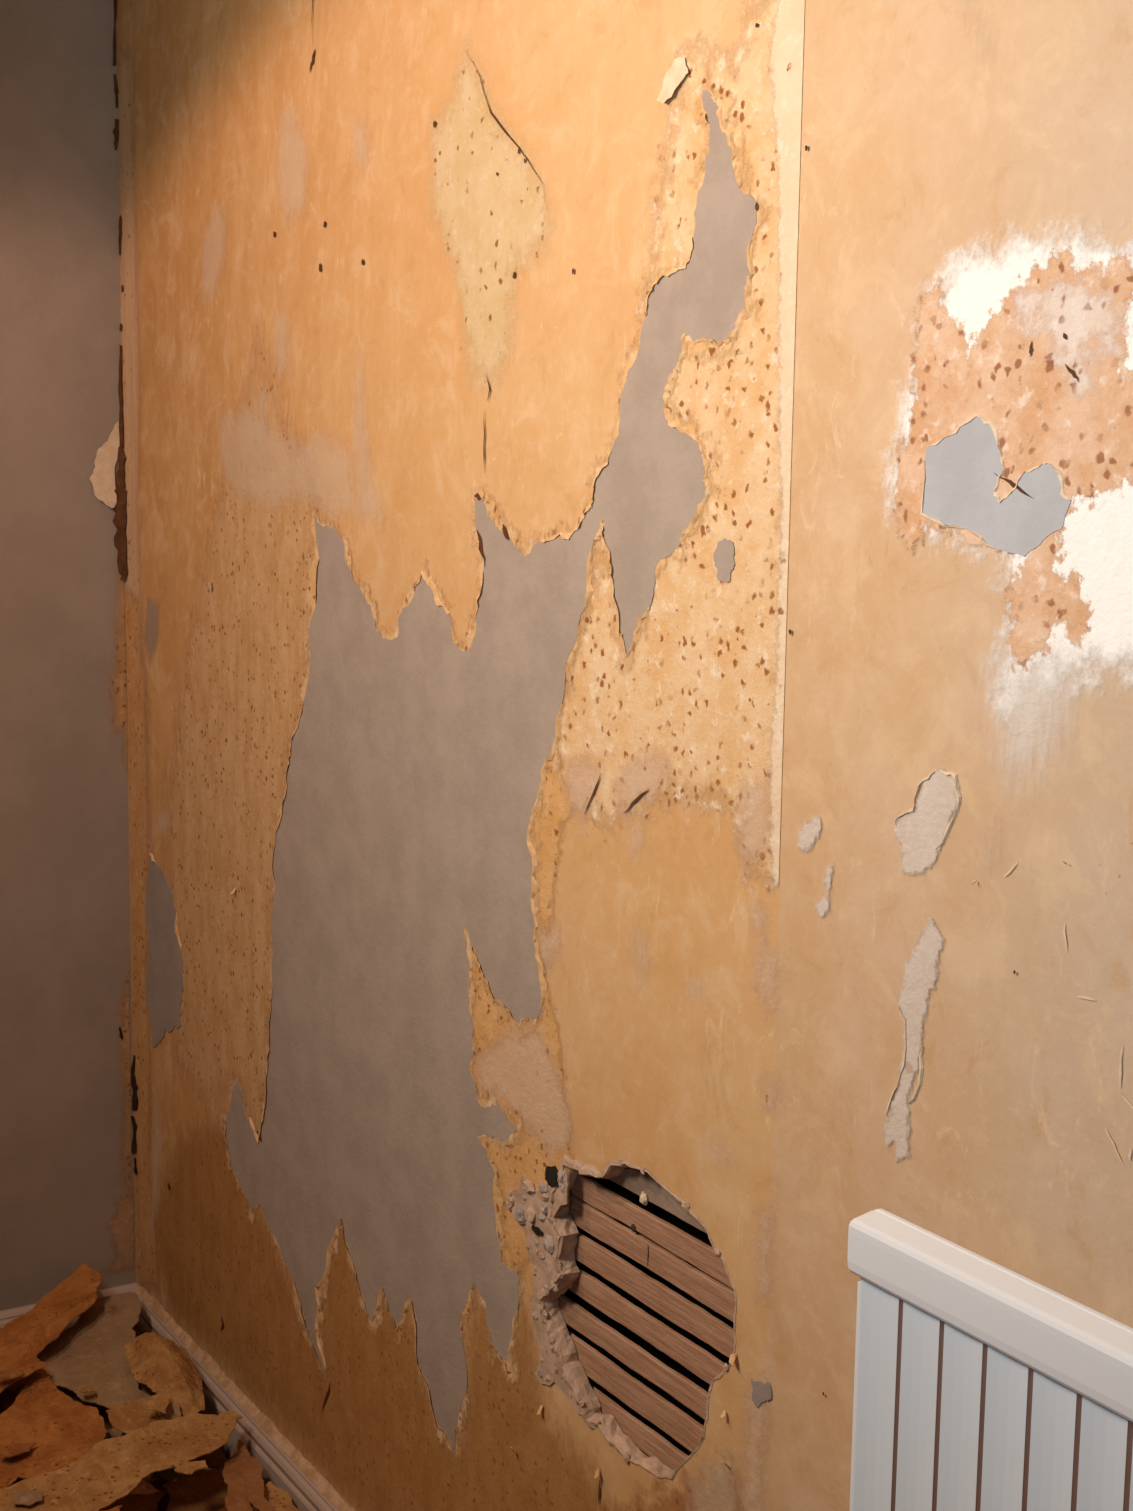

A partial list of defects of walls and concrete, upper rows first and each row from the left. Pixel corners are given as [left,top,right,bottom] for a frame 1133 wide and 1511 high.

crack [465,51,546,204]
peeling [90,421,119,508]
spalling [886,229,1133,758]
peeling [221,57,769,1480]
peeling [797,816,821,852]
peeling [894,768,961,875]
peeling [882,917,944,1161]